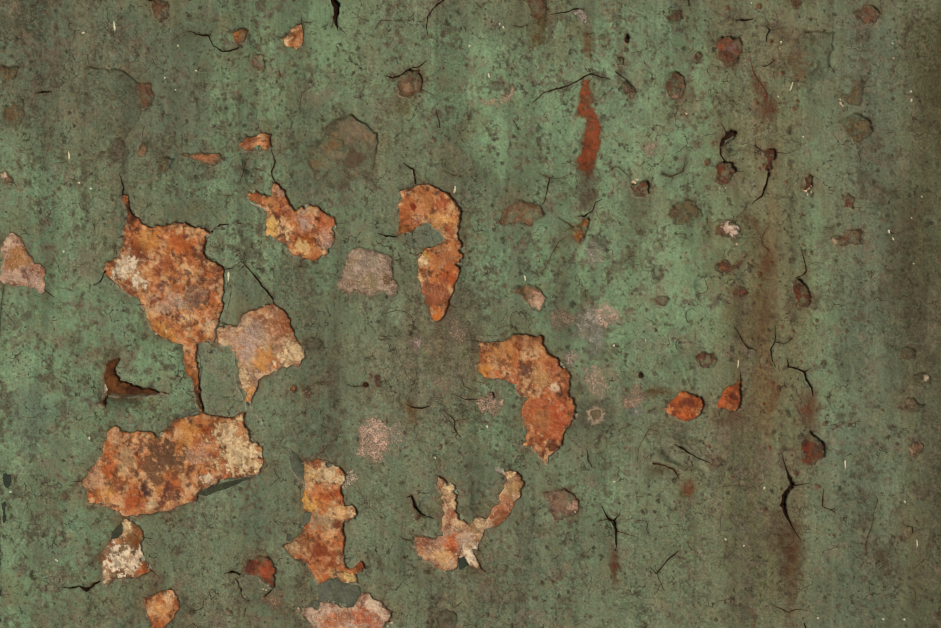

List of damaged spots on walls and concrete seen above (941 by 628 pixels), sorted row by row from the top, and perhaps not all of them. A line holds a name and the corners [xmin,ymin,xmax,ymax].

crack [301,0,346,34]
corrosion [577,80,601,207]
peeling [0,233,45,293]
peeling [248,183,337,261]
peeling [397,184,465,321]
peeling [82,195,322,587]
peeling [477,334,579,464]
peeling [285,452,393,628]
peeling [414,467,524,571]
crack [780,456,836,541]
peeling [144,590,180,628]
crack [748,606,807,628]